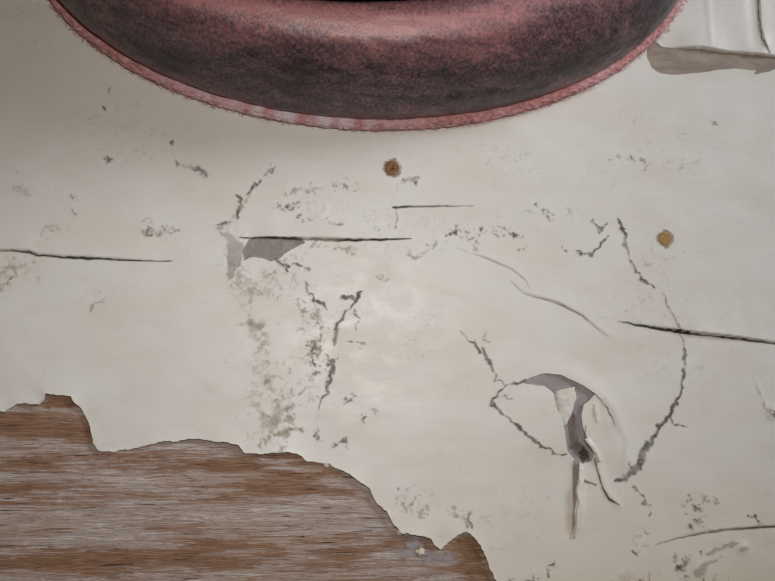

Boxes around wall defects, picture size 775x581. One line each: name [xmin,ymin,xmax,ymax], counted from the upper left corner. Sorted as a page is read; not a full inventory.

peeling [646,41,775,75]
crack [12,250,172,261]
peeling [228,238,305,279]
crack [240,234,302,242]
crack [335,236,411,244]
crack [577,218,667,303]
crack [275,258,362,332]
crack [320,361,335,403]
crack [469,341,566,456]
crack [584,322,775,505]
peeling [0,393,496,581]
peeling [695,542,748,576]